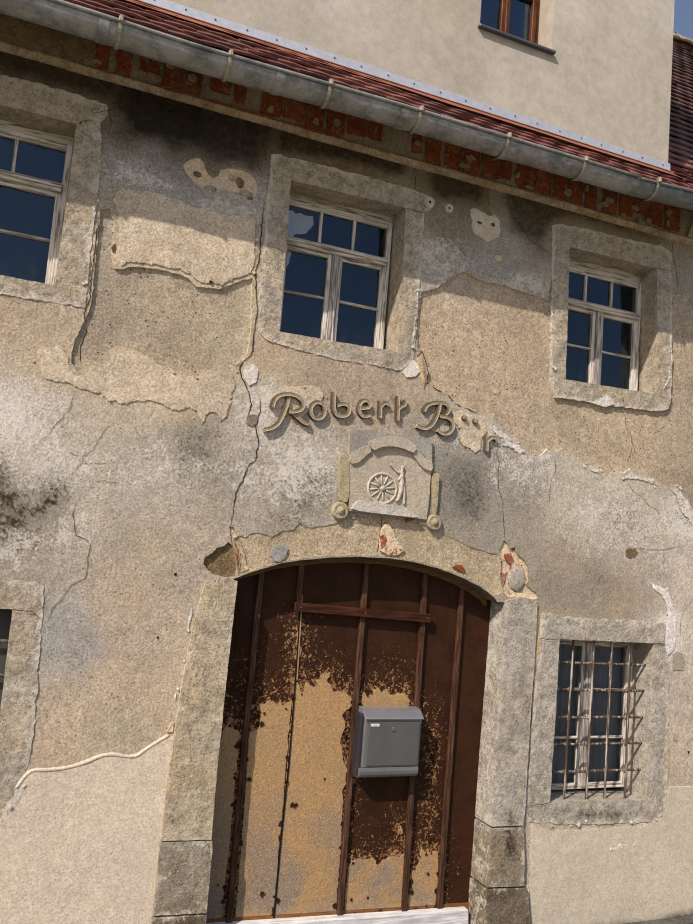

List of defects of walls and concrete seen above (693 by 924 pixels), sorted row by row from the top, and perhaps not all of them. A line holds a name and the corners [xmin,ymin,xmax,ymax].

flaking render [91,44,383,142]
spalling [183,158,258,200]
flaking render [411,133,681,232]
crack [76,216,99,371]
spalling [31,188,259,422]
crack [69,426,115,483]
crack [231,208,264,523]
spalling [411,271,693,525]
water stain [0,485,66,545]
crack [50,502,91,615]
spalling [203,517,547,670]
peeling [652,583,678,655]